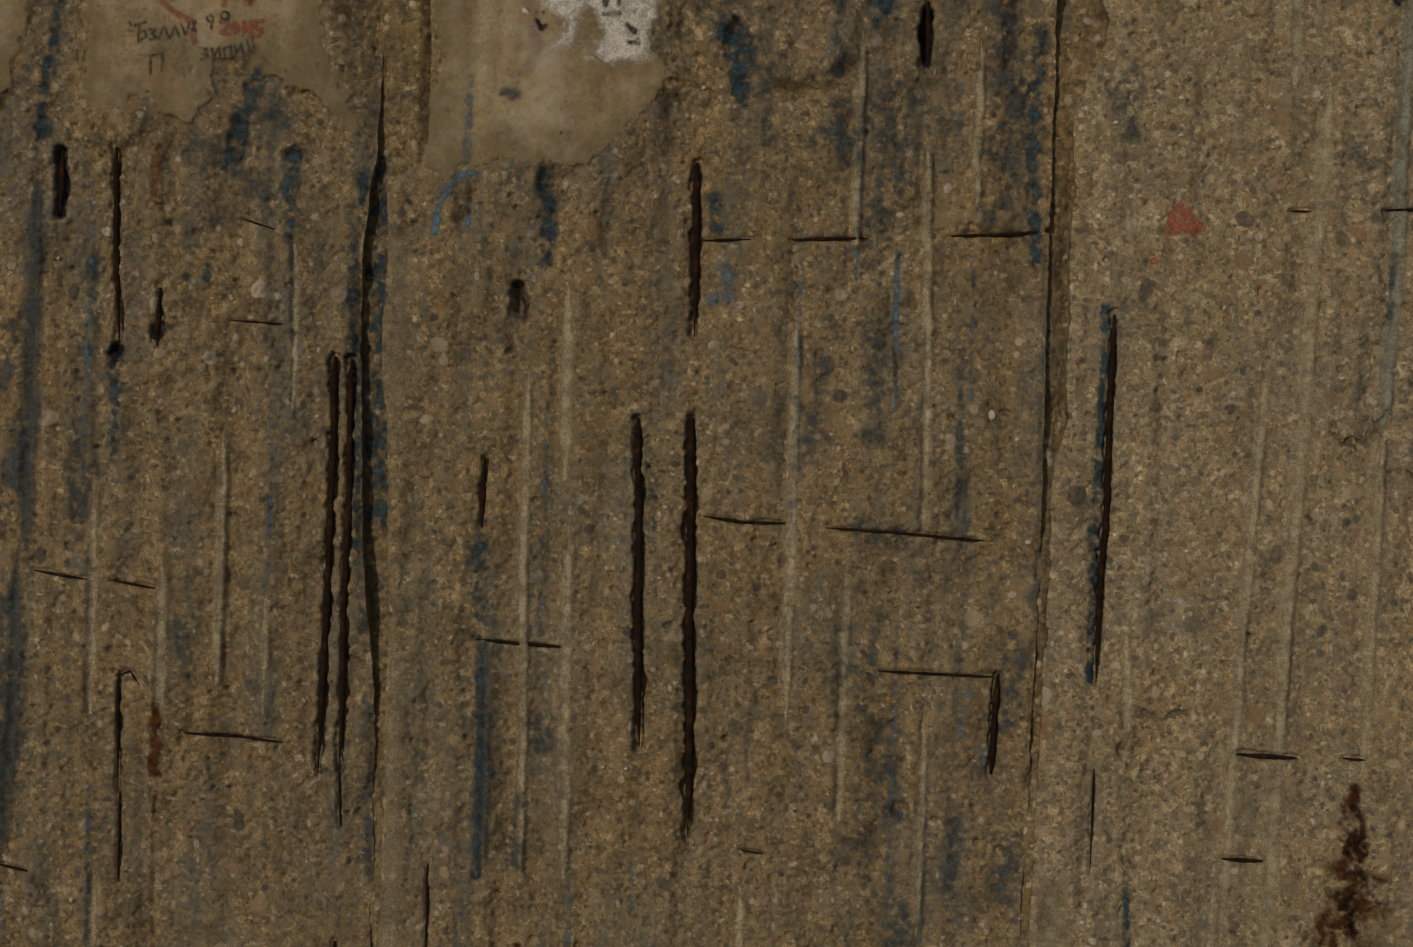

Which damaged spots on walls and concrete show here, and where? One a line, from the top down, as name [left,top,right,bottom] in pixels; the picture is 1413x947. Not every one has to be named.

spalling [0,0,383,947]
spalling [378,0,1413,947]
corrosion [1303,784,1384,947]